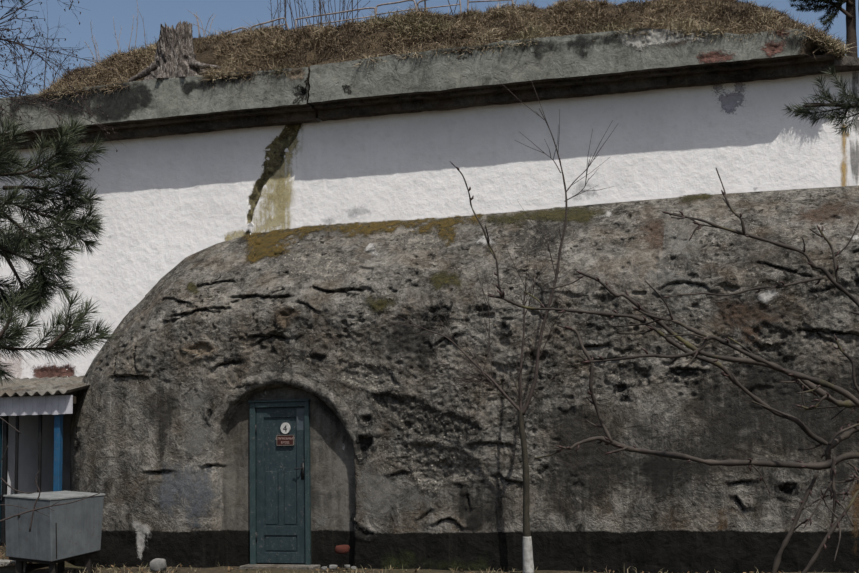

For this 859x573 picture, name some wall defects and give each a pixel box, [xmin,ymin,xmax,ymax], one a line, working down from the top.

spalling [622,28,734,63]
leakage [0,71,253,125]
crack [244,124,301,236]
leakage [252,138,298,234]
leakage [851,142,859,180]
crack [165,276,361,322]
crack [797,329,859,342]
leakage [545,354,859,520]